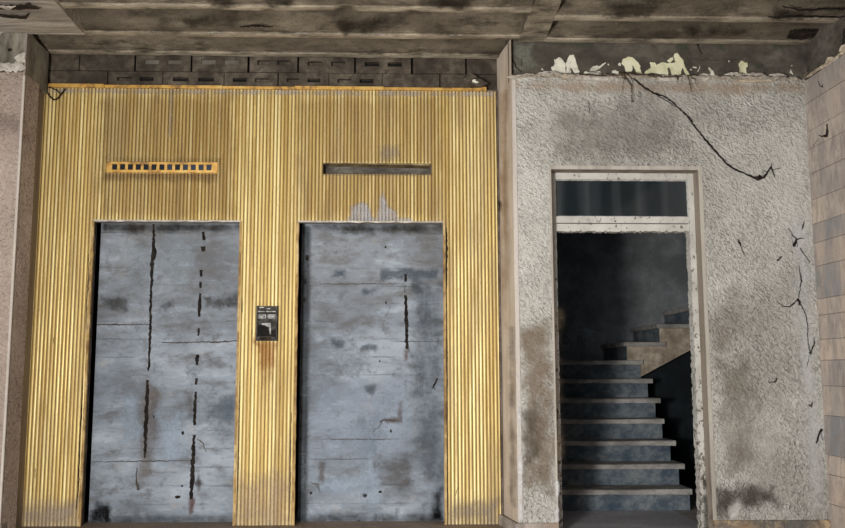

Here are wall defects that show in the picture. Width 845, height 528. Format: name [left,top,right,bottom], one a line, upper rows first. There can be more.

spalling [0,2,41,19]
spalling [0,52,26,73]
spalling [507,44,845,83]
crack [633,78,782,181]
crack [777,223,815,365]
crack [76,224,237,506]
leakage [716,486,772,518]